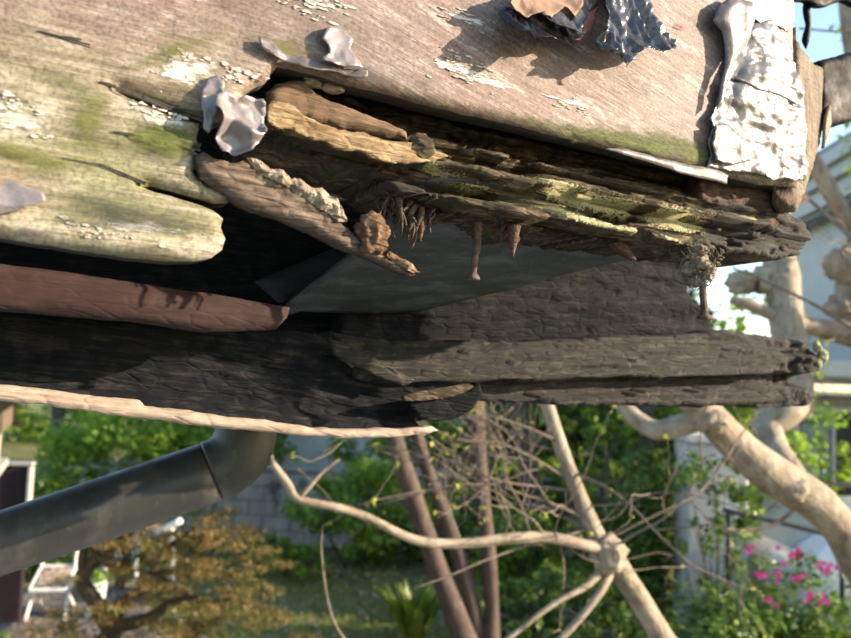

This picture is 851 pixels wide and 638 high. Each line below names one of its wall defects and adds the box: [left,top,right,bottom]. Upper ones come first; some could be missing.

peeling [498,0,678,67]
crack [100,81,204,122]
crack [113,130,135,138]
damp [127,125,195,164]
damp [534,118,711,163]
crack [62,156,146,186]